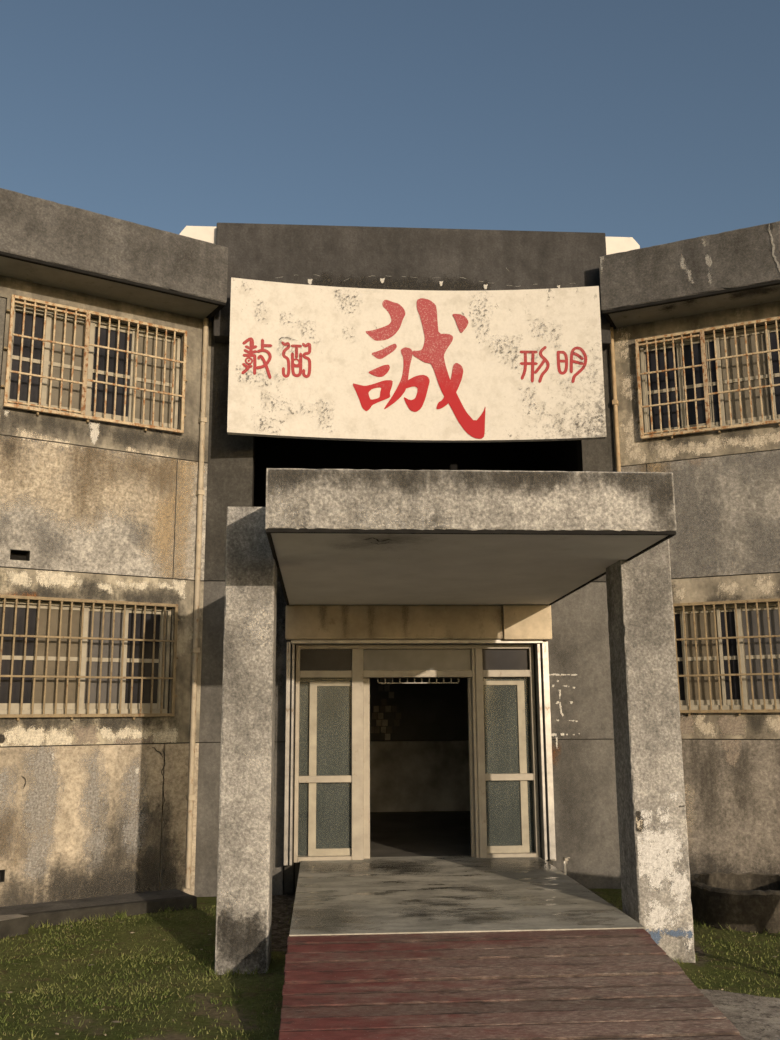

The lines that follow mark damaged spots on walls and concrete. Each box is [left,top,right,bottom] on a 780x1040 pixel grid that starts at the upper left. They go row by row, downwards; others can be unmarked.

crack [768,224,780,271]
damp [18,581,181,619]
damp [0,717,165,731]
damp [0,747,183,907]
damp [217,893,267,973]